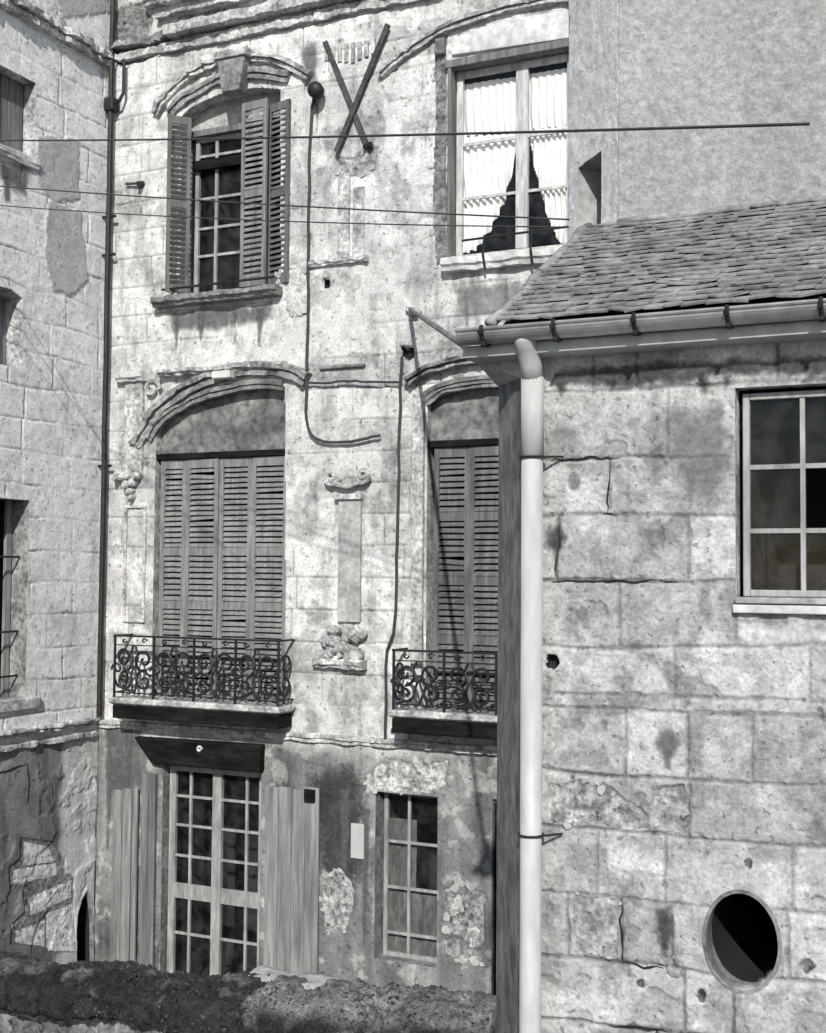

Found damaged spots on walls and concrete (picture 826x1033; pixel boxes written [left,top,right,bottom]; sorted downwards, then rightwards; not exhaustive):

peeling [28,0,67,27]
leakage [657,730,677,767]
flaking render [9,838,76,952]
peeling [319,868,354,935]
peeling [441,878,486,966]